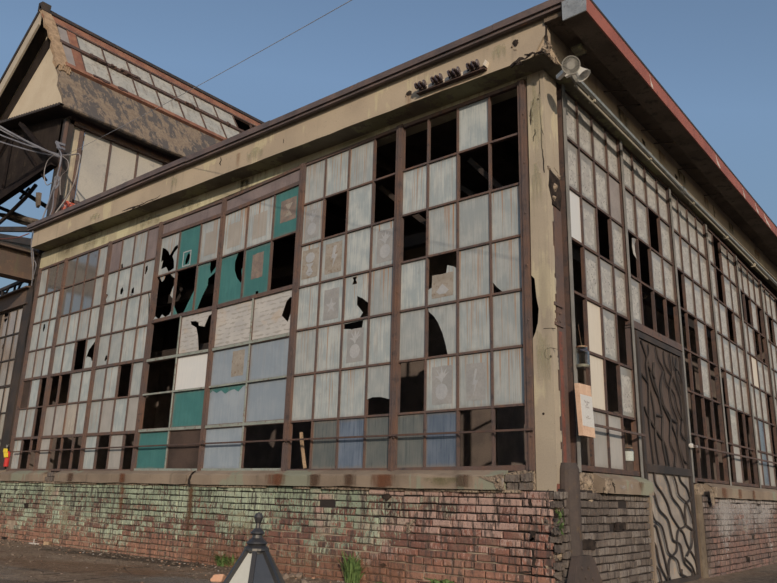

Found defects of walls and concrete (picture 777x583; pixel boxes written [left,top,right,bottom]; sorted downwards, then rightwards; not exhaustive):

crack [510,23,548,68]
crack [529,80,545,173]